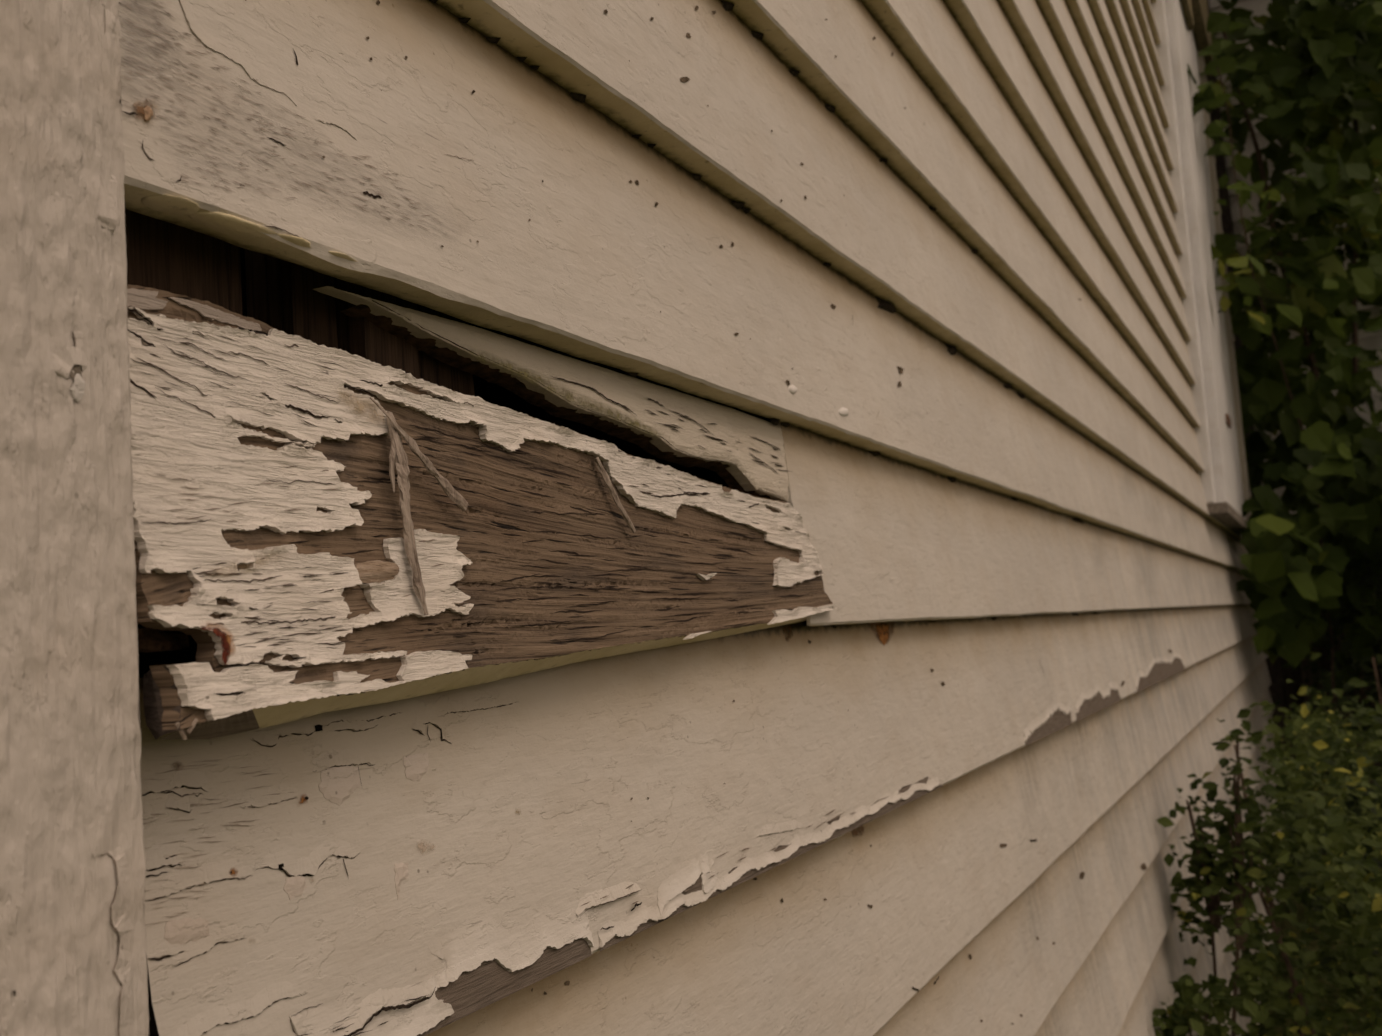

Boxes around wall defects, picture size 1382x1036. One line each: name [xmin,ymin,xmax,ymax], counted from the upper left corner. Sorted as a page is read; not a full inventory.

crack [104,0,442,240]
peeling [127,288,825,721]
peeling [767,604,838,625]
peeling [1023,650,1185,746]
crack [92,692,519,1036]
peeling [267,776,942,1036]